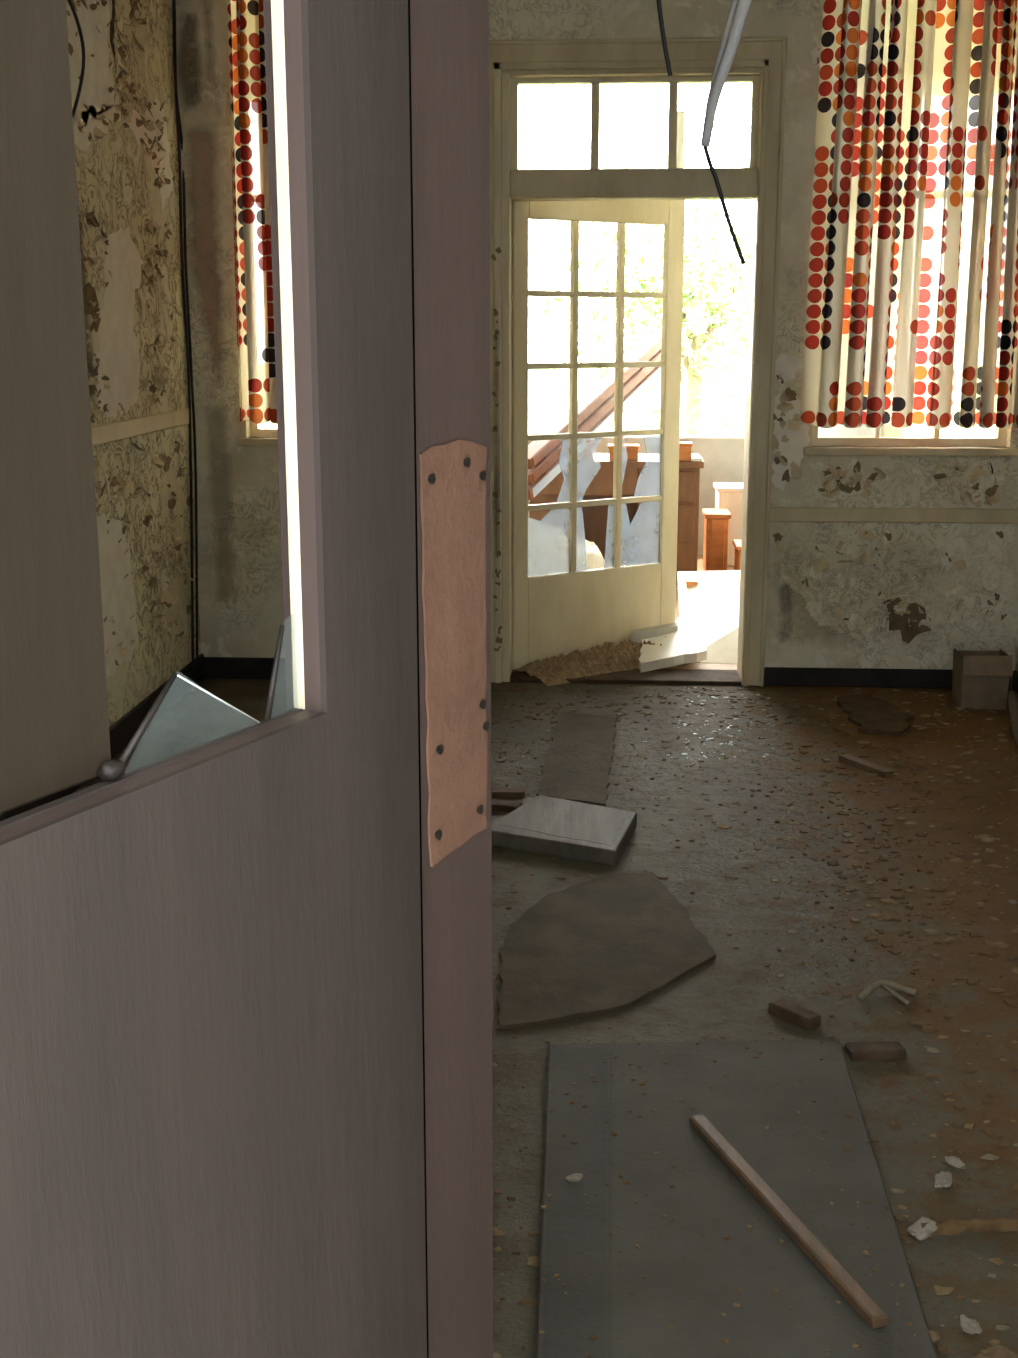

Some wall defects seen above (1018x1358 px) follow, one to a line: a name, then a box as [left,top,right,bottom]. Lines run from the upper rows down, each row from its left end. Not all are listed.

peeling [66,0,184,423]
peeling [771,353,886,500]
spalling [884,597,931,643]